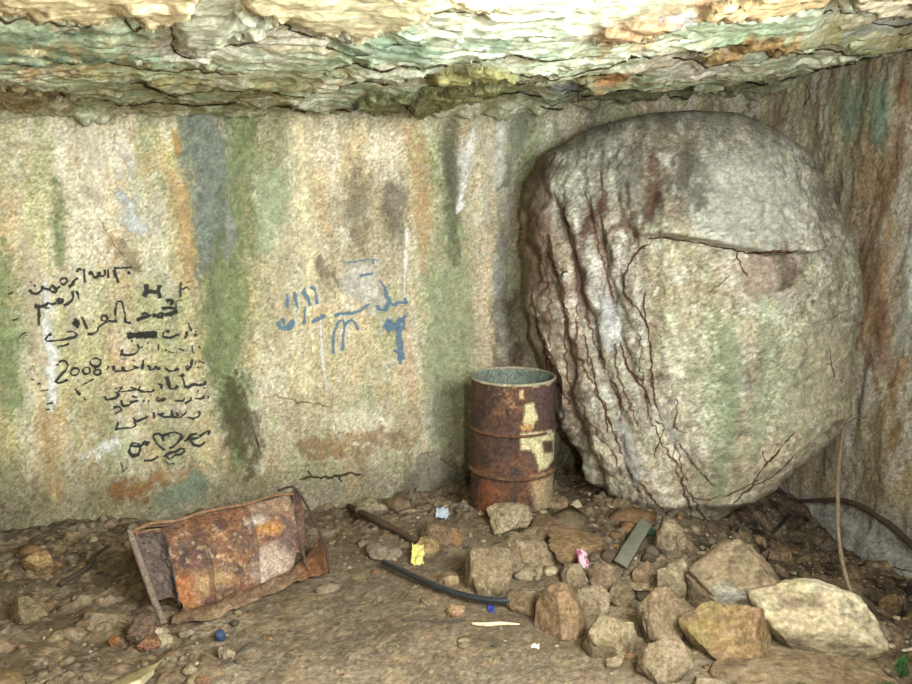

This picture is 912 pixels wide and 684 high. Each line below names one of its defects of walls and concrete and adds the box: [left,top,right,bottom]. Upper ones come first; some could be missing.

crack [0,17,92,30]
crack [124,18,143,33]
crack [0,27,316,114]
crack [278,18,912,111]
damp [181,114,236,367]
damp [221,370,263,482]
crack [299,471,362,483]